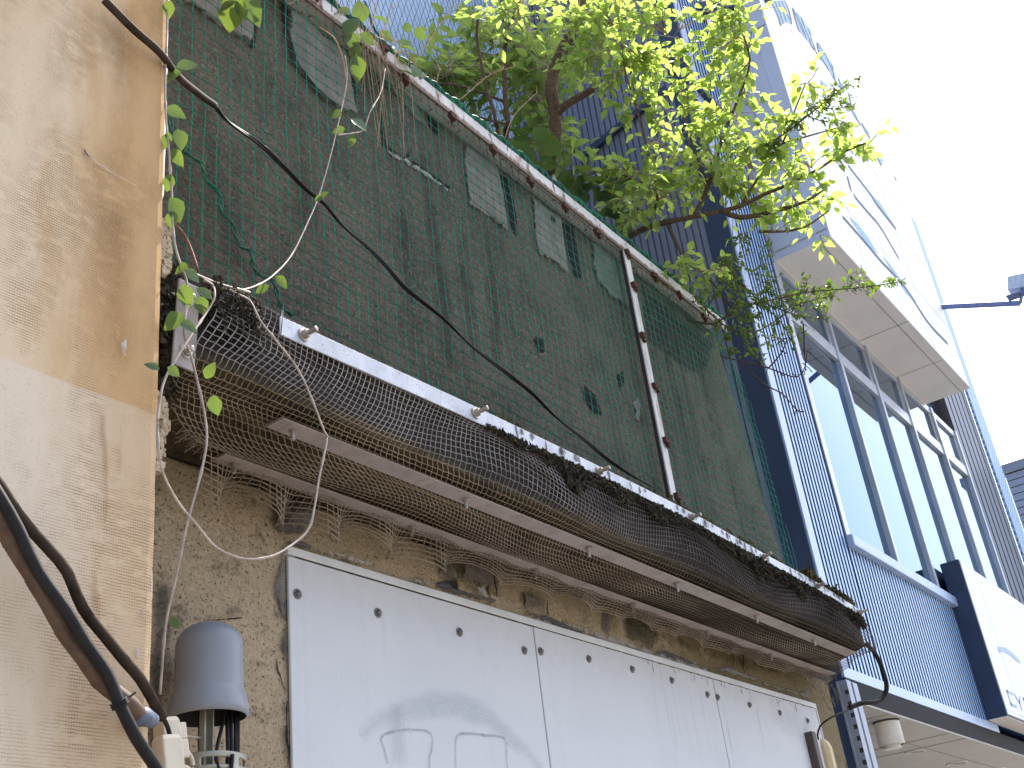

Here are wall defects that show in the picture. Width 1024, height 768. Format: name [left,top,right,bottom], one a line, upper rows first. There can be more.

peeling [464,146,518,236]
peeling [533,198,581,278]
peeling [593,243,630,306]
spalling [604,611,658,647]